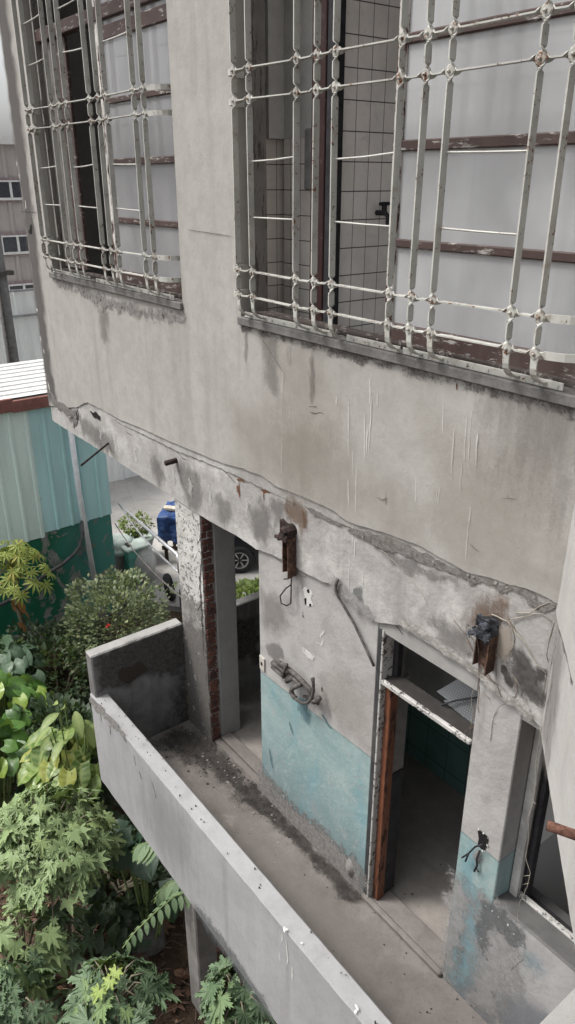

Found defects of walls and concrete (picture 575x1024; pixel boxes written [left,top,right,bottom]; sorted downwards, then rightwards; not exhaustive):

spalling [48,384,100,428]
rust [285,500,307,529]
peeling [182,624,214,744]
water stain [501,650,546,706]
water stain [97,626,362,902]